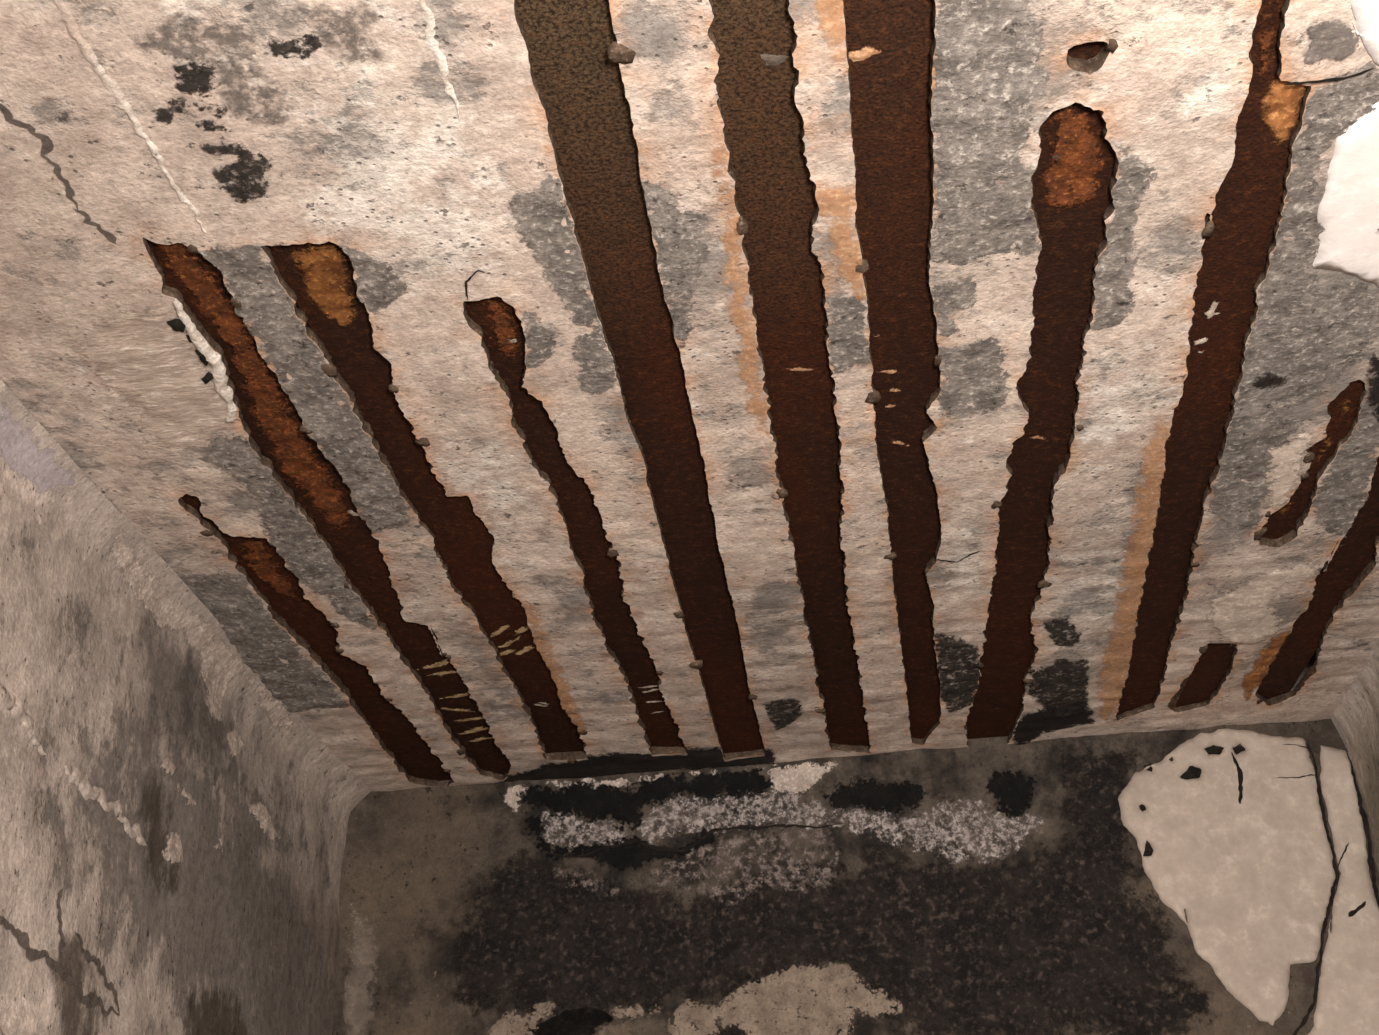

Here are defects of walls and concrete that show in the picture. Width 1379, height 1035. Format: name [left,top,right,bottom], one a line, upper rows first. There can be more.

spalling [1066,38,1118,73]
crack [0,103,117,244]
rust [815,189,867,300]
spalling [708,0,1049,754]
spalling [1006,110,1158,744]
rust [1097,418,1168,720]
rust [525,605,587,732]
crack [0,888,120,1017]
damp [504,784,528,812]
damp [541,761,1043,903]
crack [1278,738,1379,1035]
damp [596,1019,637,1035]